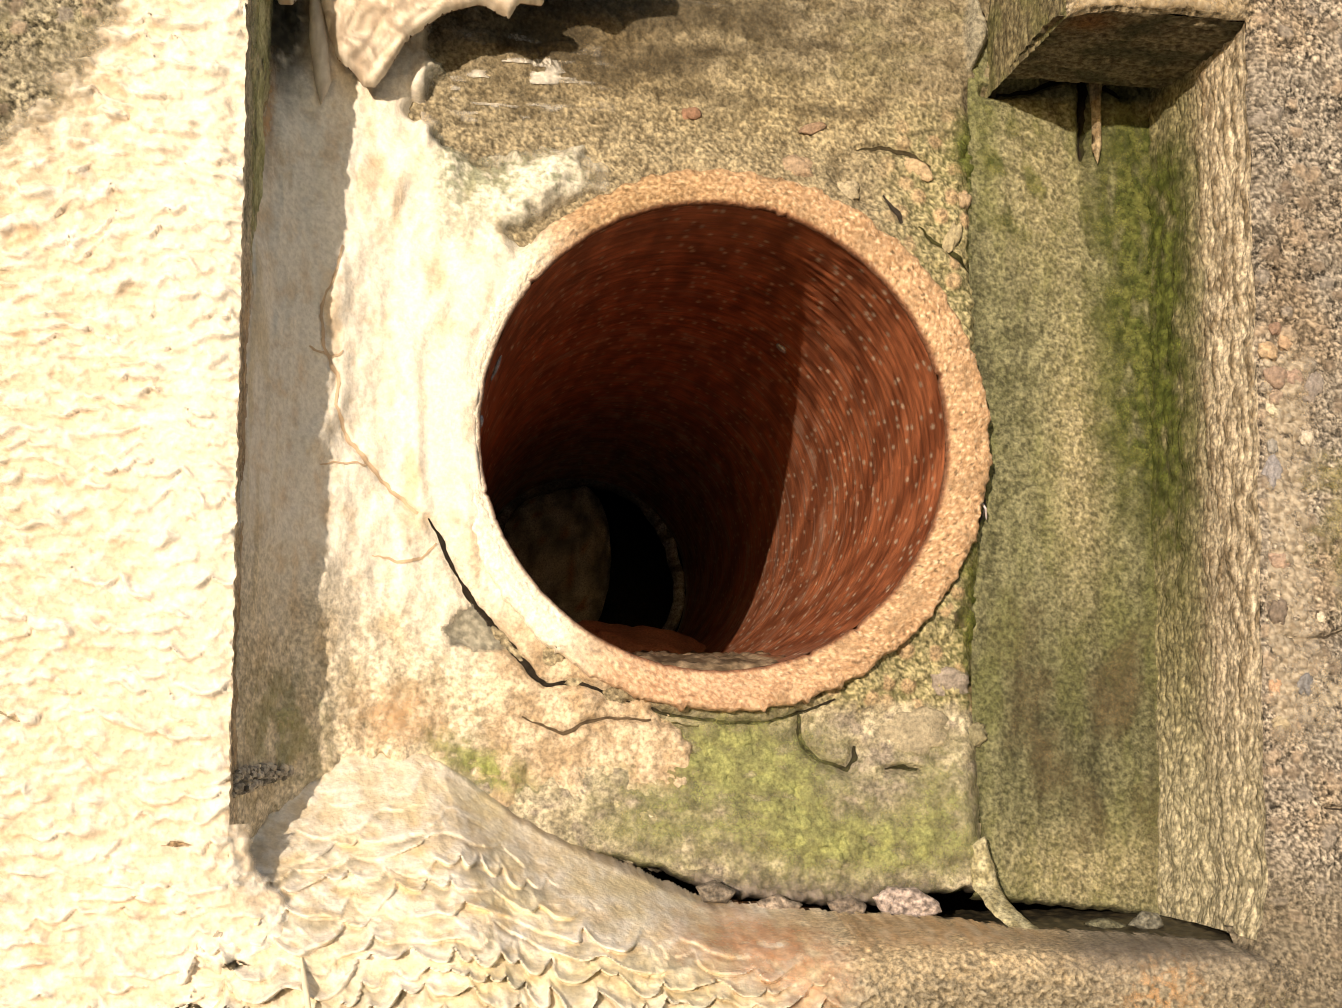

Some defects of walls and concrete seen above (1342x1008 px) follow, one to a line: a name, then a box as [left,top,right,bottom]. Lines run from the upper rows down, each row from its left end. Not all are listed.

crack [309,245,918,772]